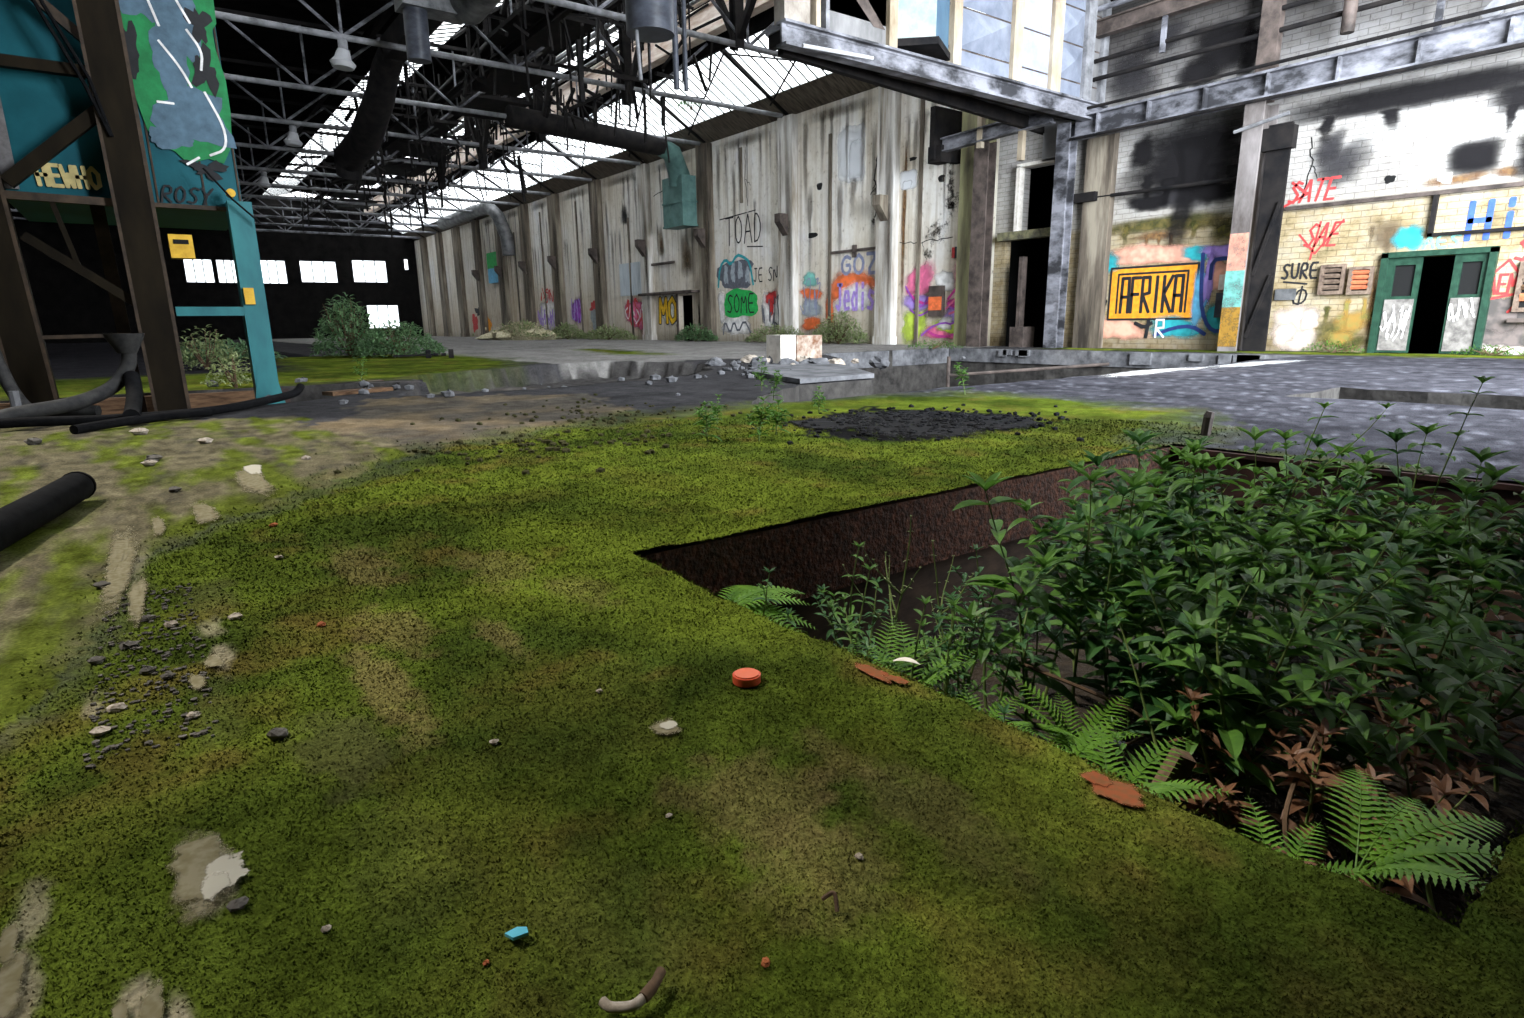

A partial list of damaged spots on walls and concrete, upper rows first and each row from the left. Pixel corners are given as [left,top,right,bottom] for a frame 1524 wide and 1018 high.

leakage [1318,116,1335,138]
leakage [1506,105,1518,127]
leakage [1228,165,1238,190]
leakage [1142,139,1208,246]